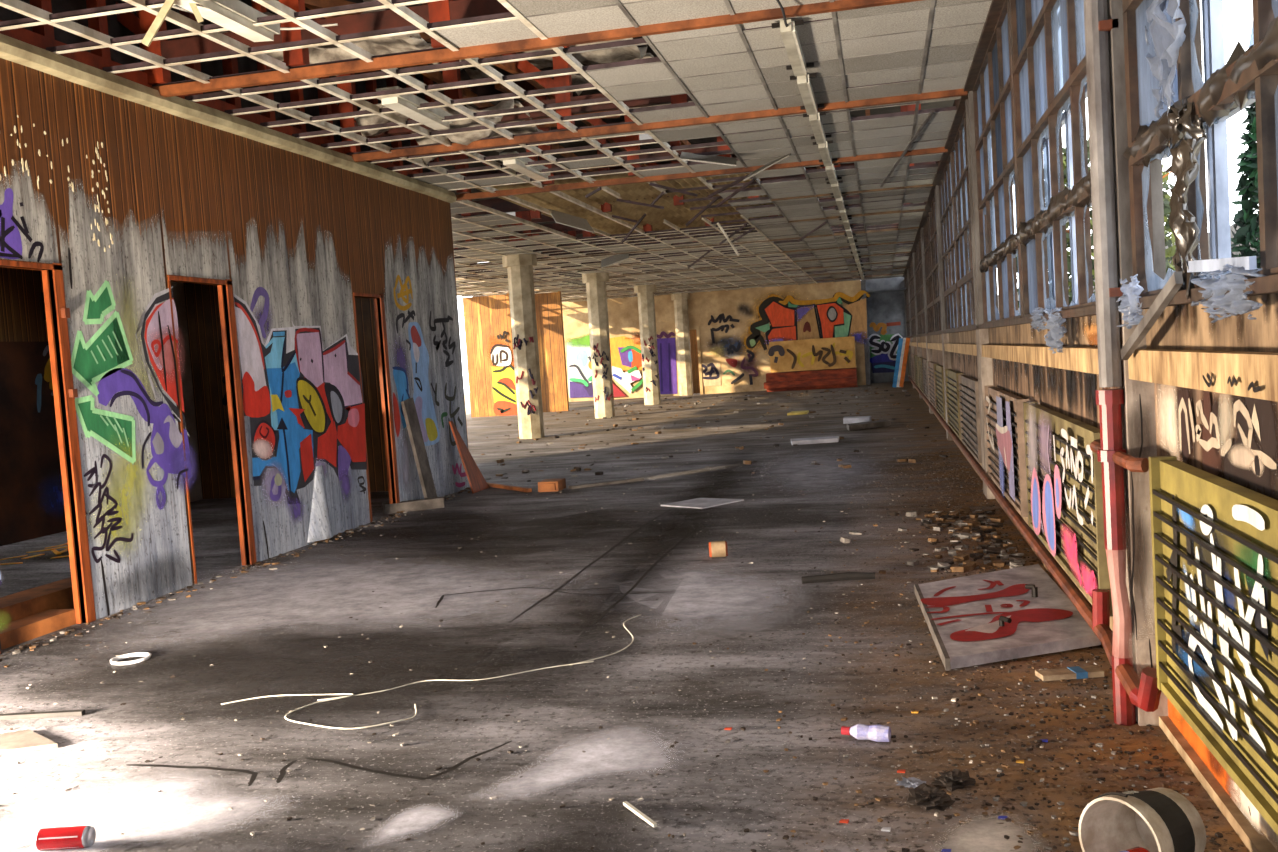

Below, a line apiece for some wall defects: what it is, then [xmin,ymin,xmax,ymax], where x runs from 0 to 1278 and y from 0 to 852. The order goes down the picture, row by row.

peeling [73,375,193,620]
peeling [0,115,357,430]
peeling [244,416,370,562]
peeling [384,240,470,502]
crack [435,509,692,625]